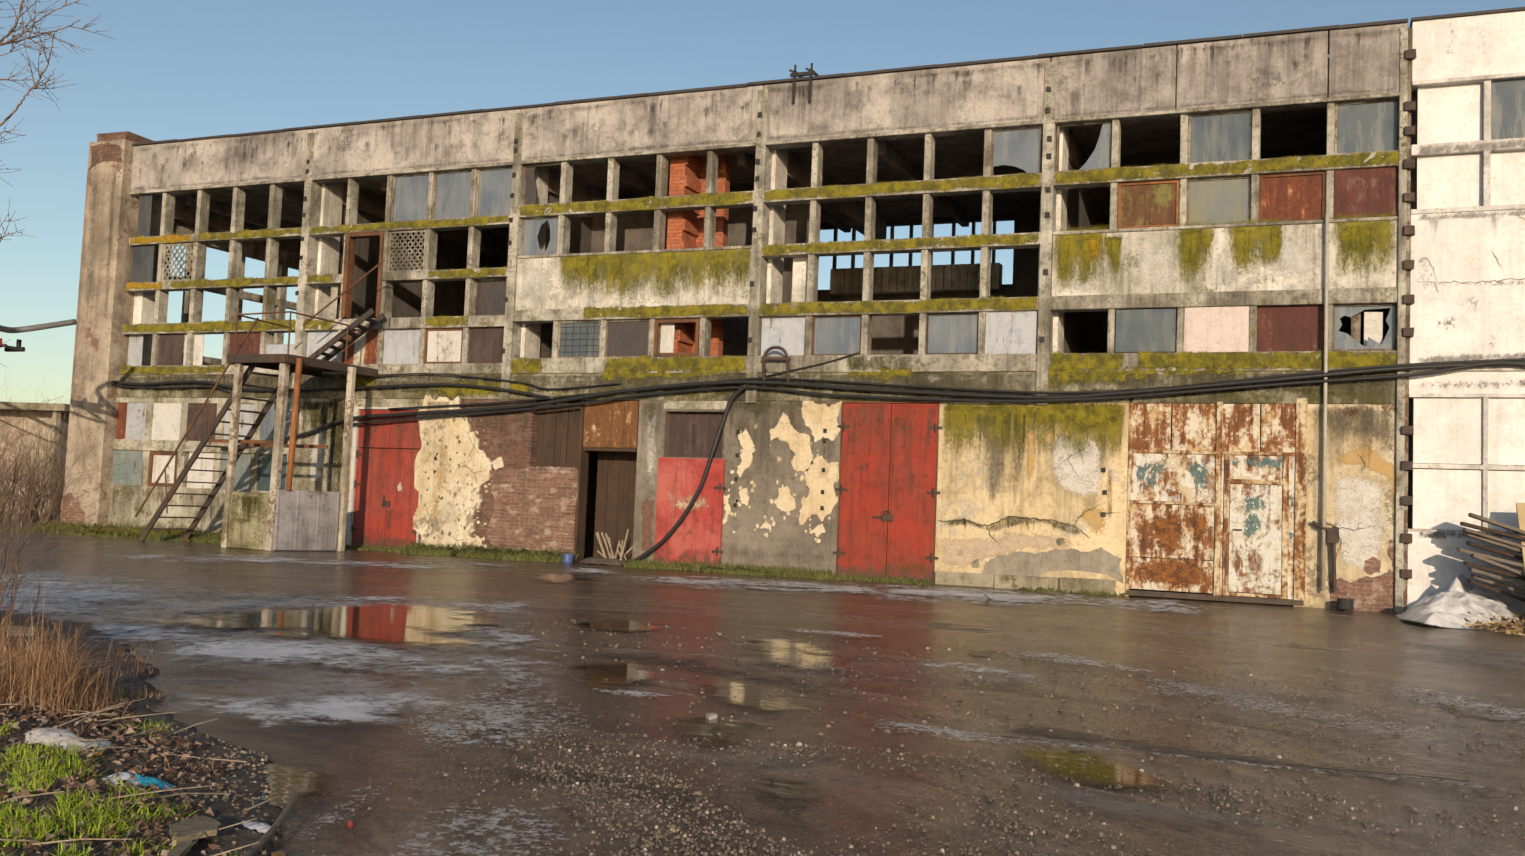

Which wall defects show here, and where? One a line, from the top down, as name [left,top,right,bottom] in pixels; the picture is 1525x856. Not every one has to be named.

damp [521,256,687,303]
damp [1059,236,1120,293]
damp [1138,230,1251,287]
damp [1271,227,1312,275]
damp [1339,224,1375,264]
crack [1420,251,1525,291]
spalling [398,395,504,549]
peeling [641,401,842,551]
damp [965,413,1029,498]
crack [939,445,1120,543]
damp [1049,414,1115,496]
corrosion [1139,489,1209,588]